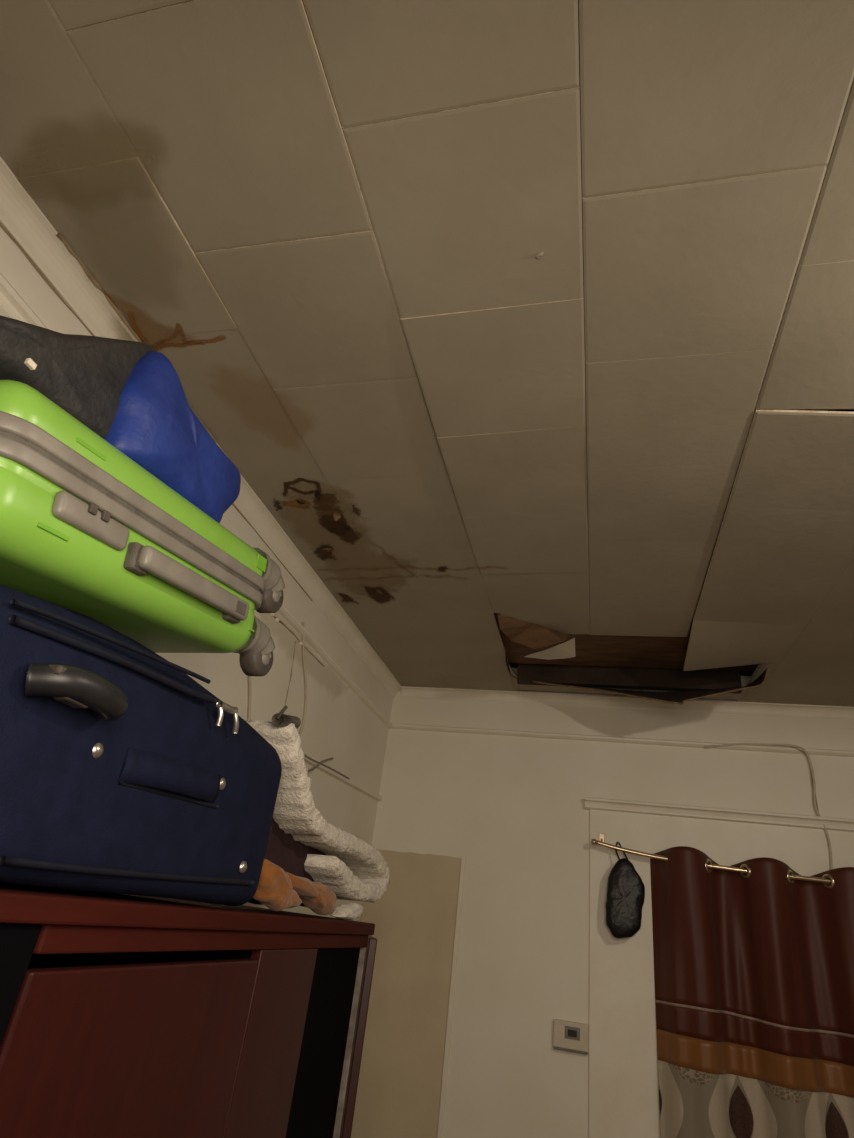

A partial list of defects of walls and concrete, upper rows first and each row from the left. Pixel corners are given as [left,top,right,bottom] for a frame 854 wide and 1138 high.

damp [274,478,362,561]
damp [338,586,395,604]